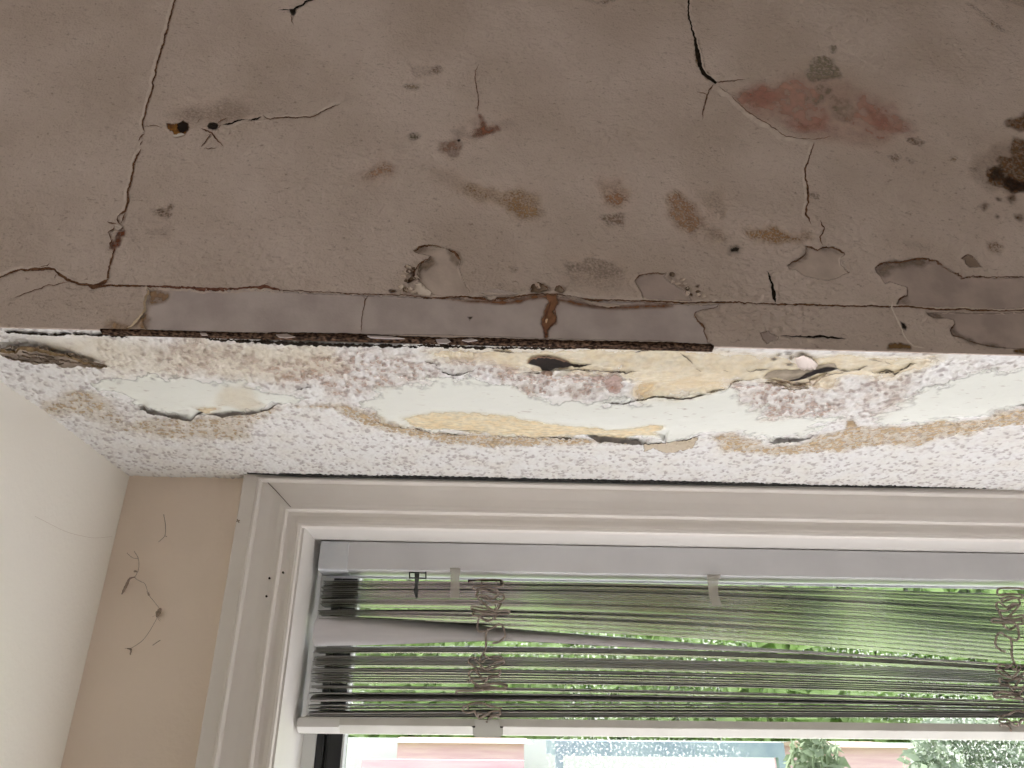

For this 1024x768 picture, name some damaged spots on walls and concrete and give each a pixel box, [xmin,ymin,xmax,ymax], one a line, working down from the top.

crack [281,0,313,25]
crack [117,0,176,216]
crack [223,102,340,129]
corrosion [476,116,498,135]
crack [687,0,827,245]
peeling [127,244,718,344]
crack [0,249,1024,329]
corrosion [467,294,669,338]
peeling [875,254,1024,349]
spalling [0,345,107,369]
peeling [795,355,818,371]
peeling [643,437,698,453]